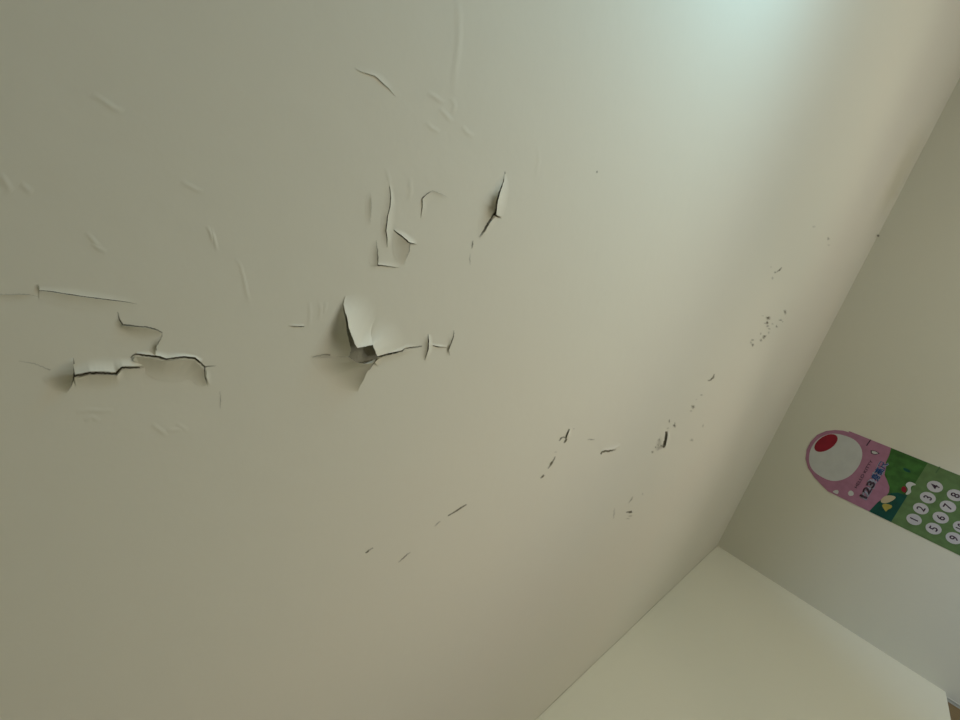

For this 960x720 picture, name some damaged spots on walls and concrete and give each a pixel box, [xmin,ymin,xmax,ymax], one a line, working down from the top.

crack [0,284,138,311]
peeling [42,315,213,393]
peeling [311,292,409,392]